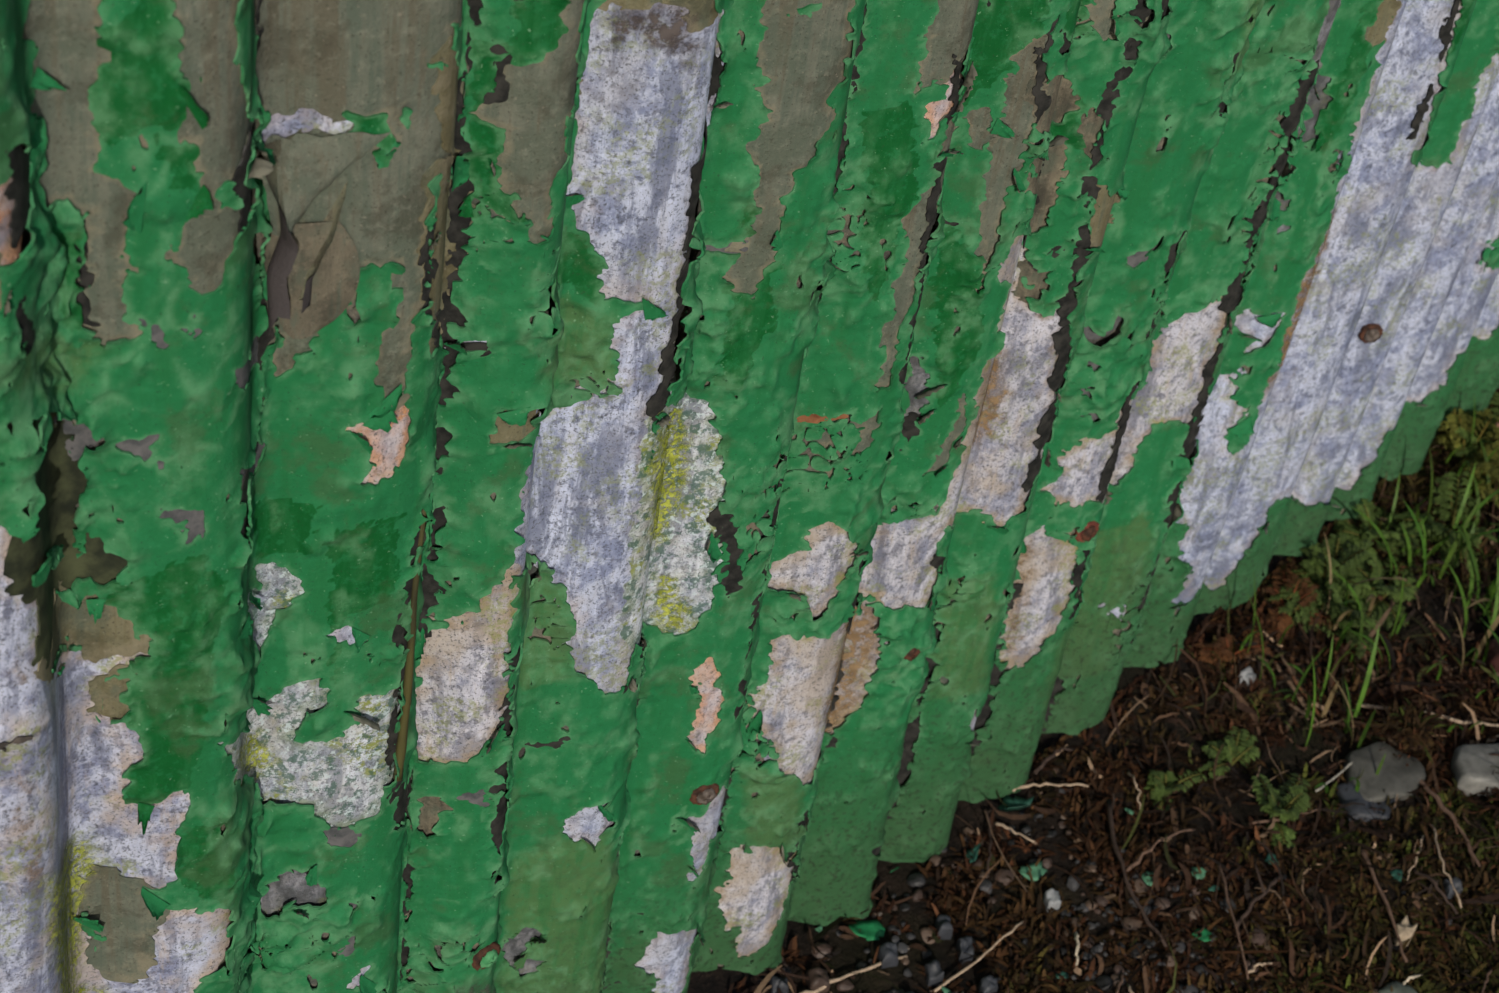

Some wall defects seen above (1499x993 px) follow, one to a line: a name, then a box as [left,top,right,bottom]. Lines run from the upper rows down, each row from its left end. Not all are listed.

peeling [0,0,202,357]
peeling [705,0,856,299]
spalling [54,414,164,470]
peeling [160,0,743,854]
peeling [746,0,1499,785]
peeling [0,526,232,993]
peeling [635,926,705,993]
peeling [677,773,732,881]
peeling [714,843,797,958]